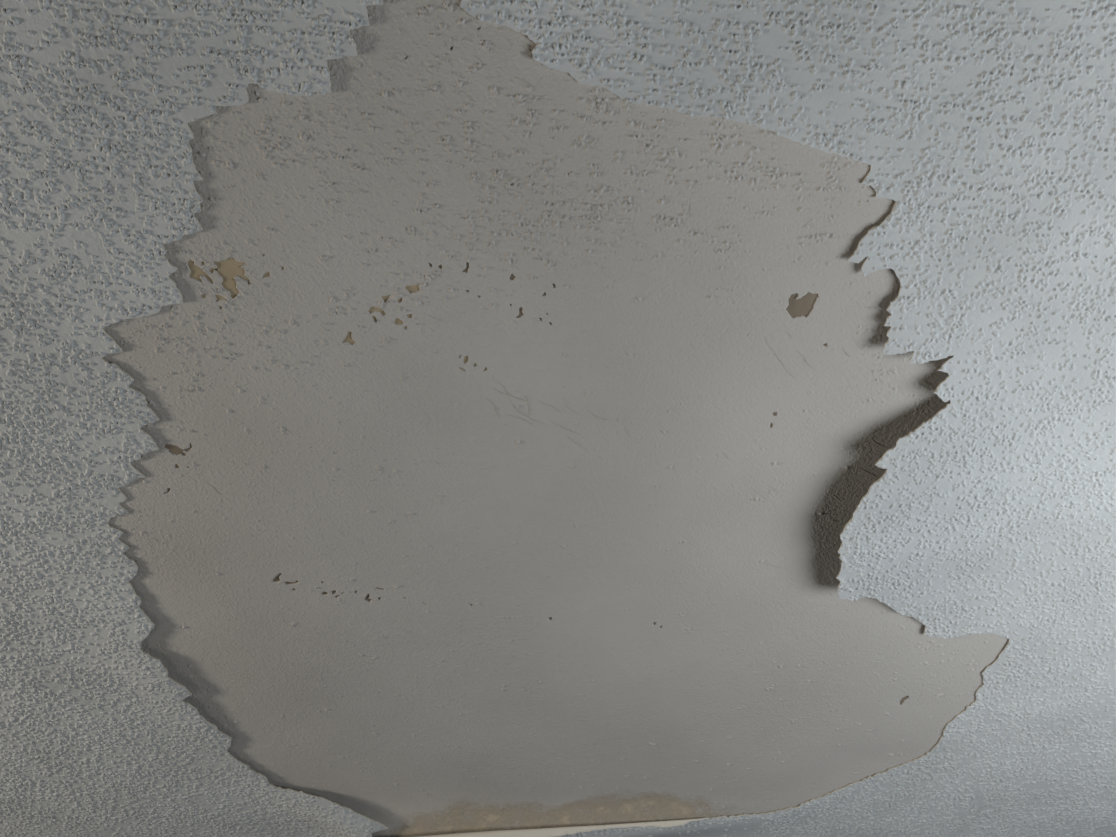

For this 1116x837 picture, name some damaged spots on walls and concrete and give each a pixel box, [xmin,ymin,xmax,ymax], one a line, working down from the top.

spalling [188,259,213,283]
spalling [209,257,251,298]
spalling [786,292,819,317]
spalling [164,443,193,456]
peeling [246,767,389,837]
leakage [399,797,711,836]
peeling [418,805,708,837]